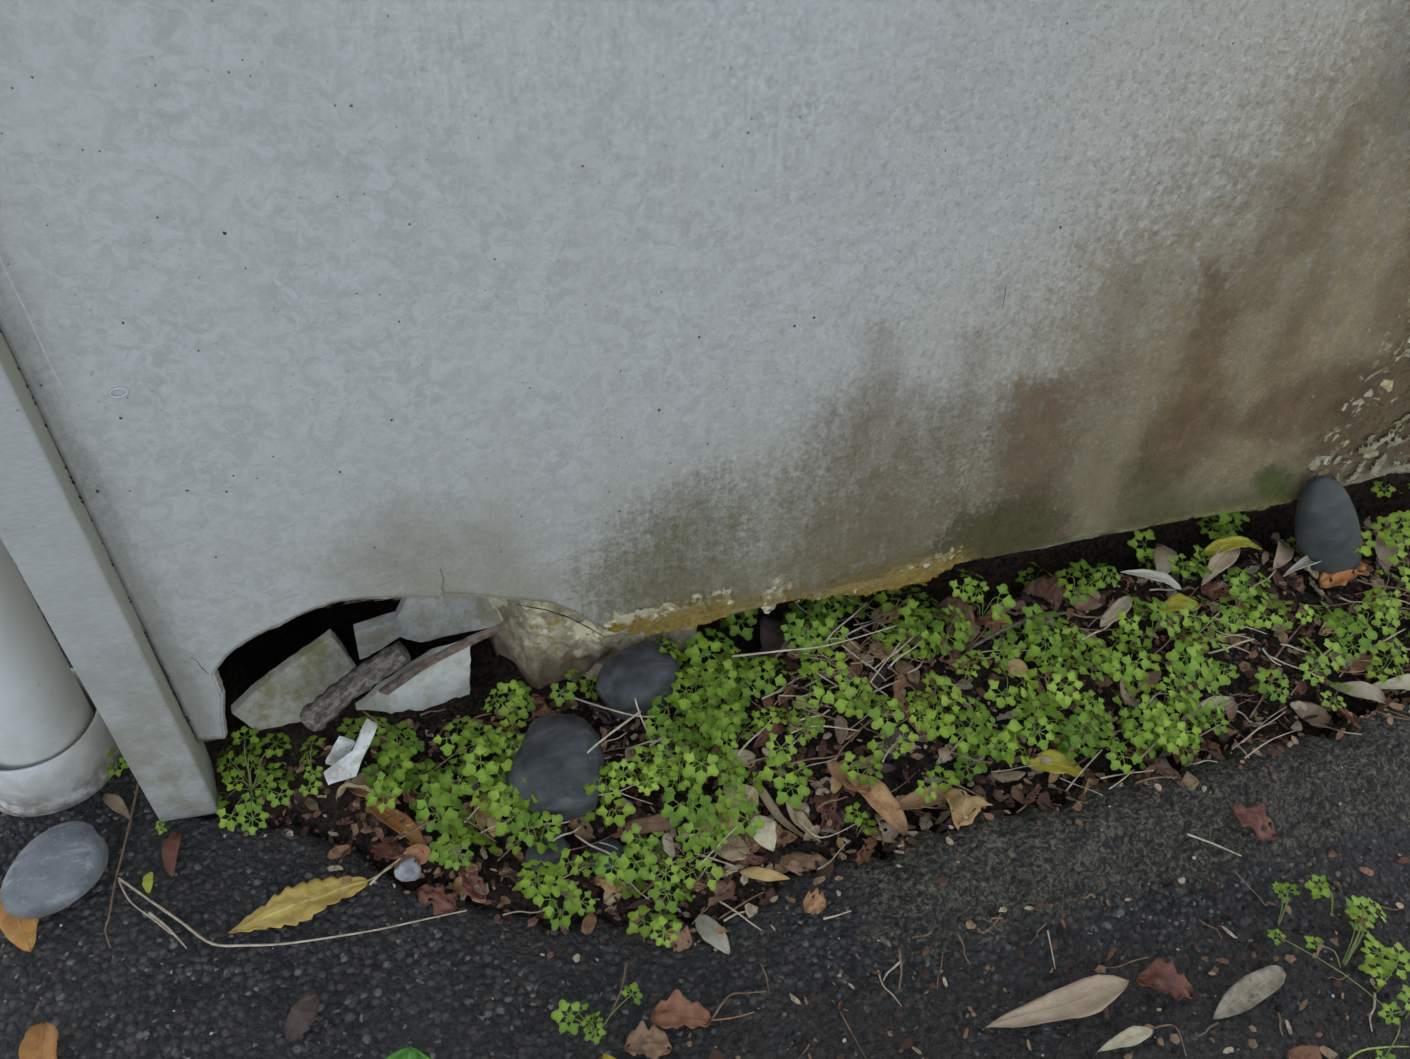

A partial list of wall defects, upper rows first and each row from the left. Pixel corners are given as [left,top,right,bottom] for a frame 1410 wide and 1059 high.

peeling [1308,291,1410,483]
water stain [621,416,1195,619]
spalling [211,639,249,739]
spalling [324,718,377,785]